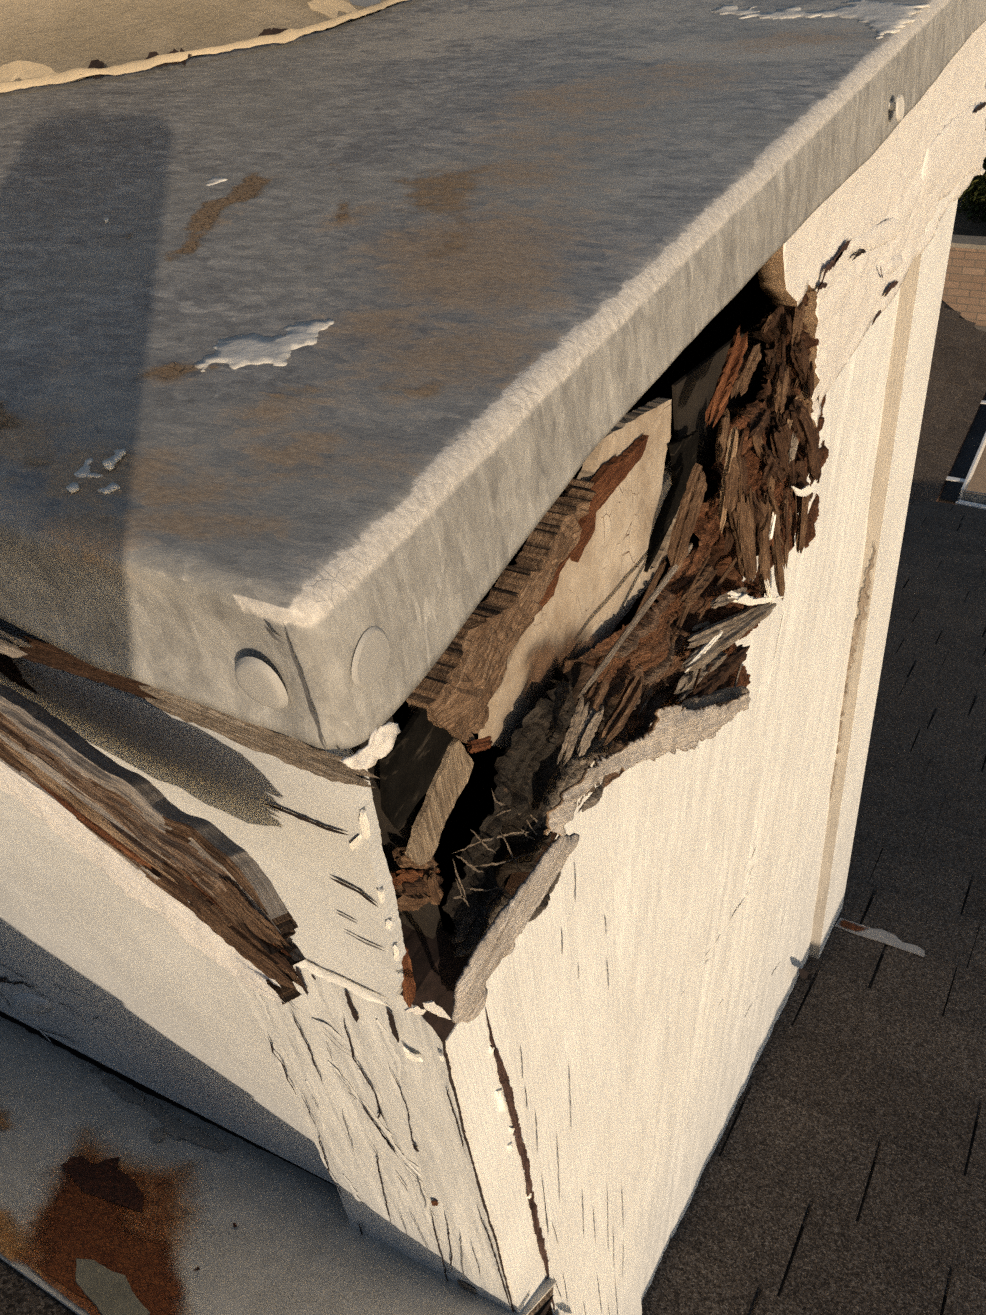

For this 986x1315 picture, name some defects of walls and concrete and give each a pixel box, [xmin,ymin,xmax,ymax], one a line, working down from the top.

peeling [0,60,85,87]
peeling [307,0,381,19]
peeling [791,485,813,497]
peeling [736,594,785,605]
peeling [295,692,751,1023]
corrosion [0,1139,190,1315]
crack [0,963,513,1311]
crack [485,1009,556,1315]